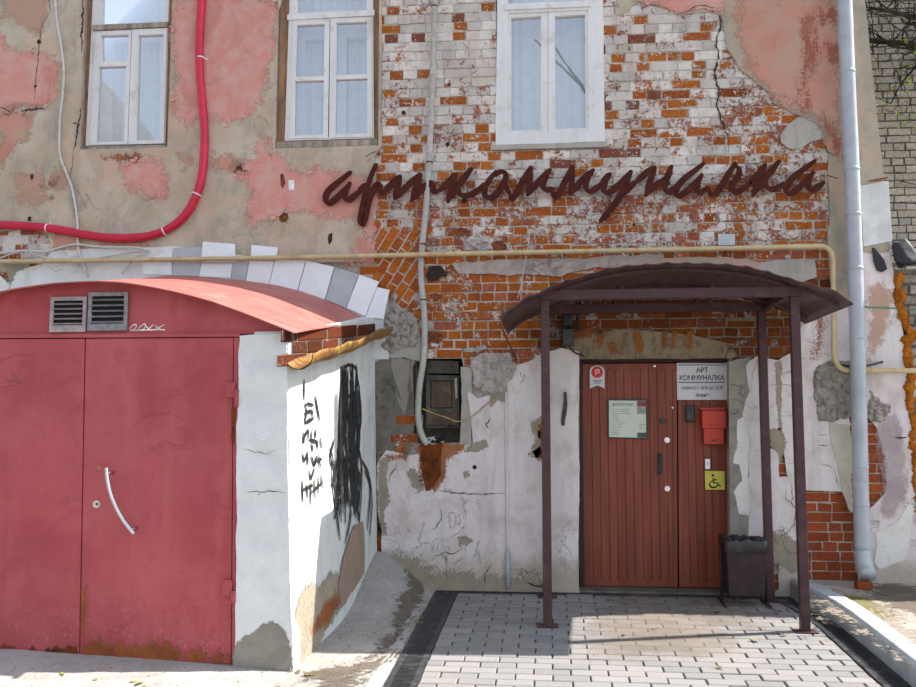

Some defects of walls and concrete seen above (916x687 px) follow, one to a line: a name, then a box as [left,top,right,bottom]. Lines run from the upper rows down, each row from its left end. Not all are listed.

crack [3,5,50,116]
peeling [0,31,62,169]
peeling [169,0,278,131]
crack [683,5,730,152]
spalling [211,0,842,477]
rust [29,636,230,665]
spalling [232,521,365,672]
spalling [377,415,424,537]
peeling [733,416,750,516]
spalling [762,526,797,591]
spalling [806,417,858,581]
spalling [867,418,886,508]